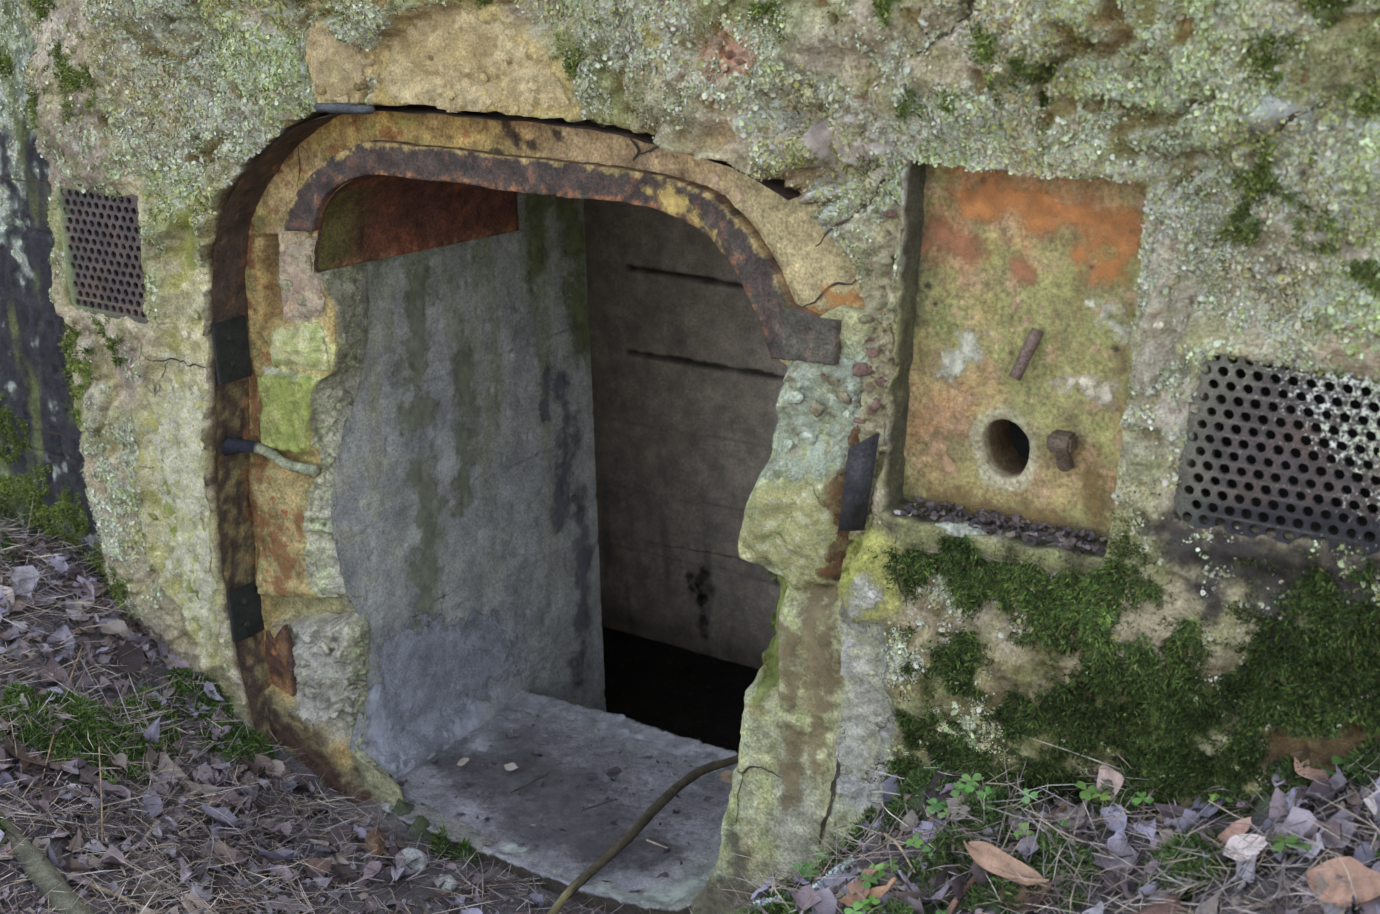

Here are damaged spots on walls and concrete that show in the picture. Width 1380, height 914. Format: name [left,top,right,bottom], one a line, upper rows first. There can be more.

rust [921,173,1144,285]
rust [811,292,862,315]
rust [248,359,303,597]
damp [540,366,593,685]
rust [847,397,862,447]
rust [926,481,1071,533]
damp [686,568,714,638]
damp [752,575,785,705]
rust [777,463,850,809]
damp [367,685,760,914]